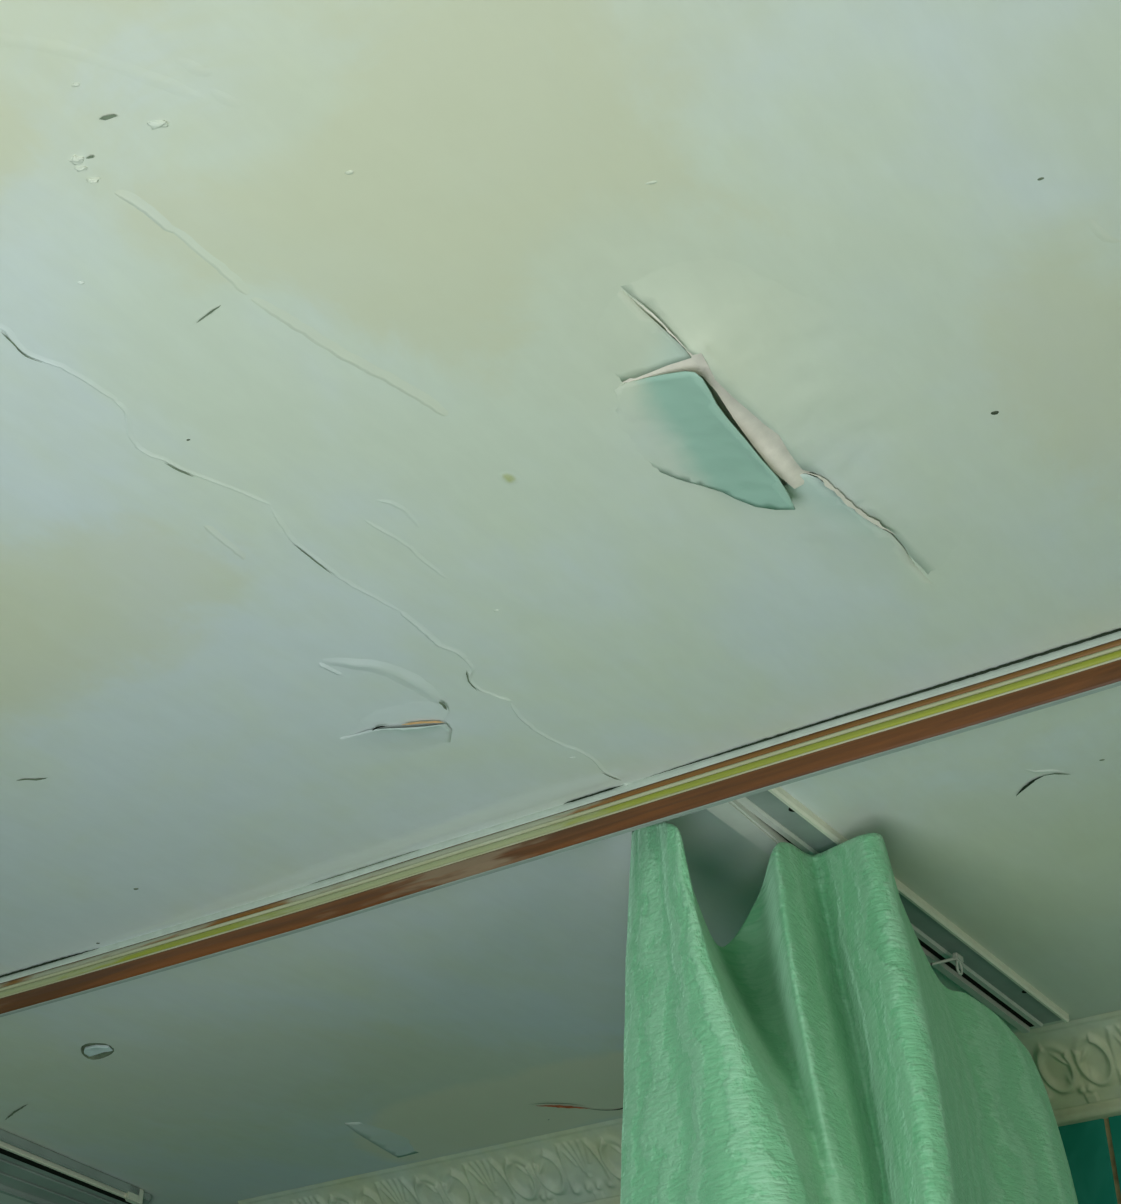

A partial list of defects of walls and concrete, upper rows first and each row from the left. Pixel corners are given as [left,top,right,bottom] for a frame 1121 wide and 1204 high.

flaking render [595,258,965,585]
crack [0,323,621,804]
crack [650,629,1121,777]
crack [1016,769,1070,796]
crack [313,851,415,884]
crack [0,948,98,978]